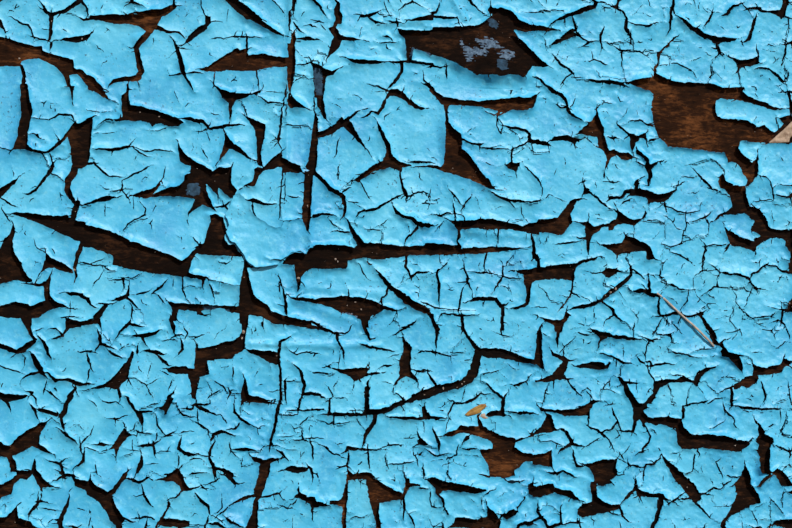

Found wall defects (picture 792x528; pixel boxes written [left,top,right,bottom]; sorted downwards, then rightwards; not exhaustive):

crack [0,109,176,231]
crack [153,0,266,107]
peeling [0,0,792,416]
crack [0,158,792,528]
crack [179,0,792,281]
peeling [330,306,792,528]